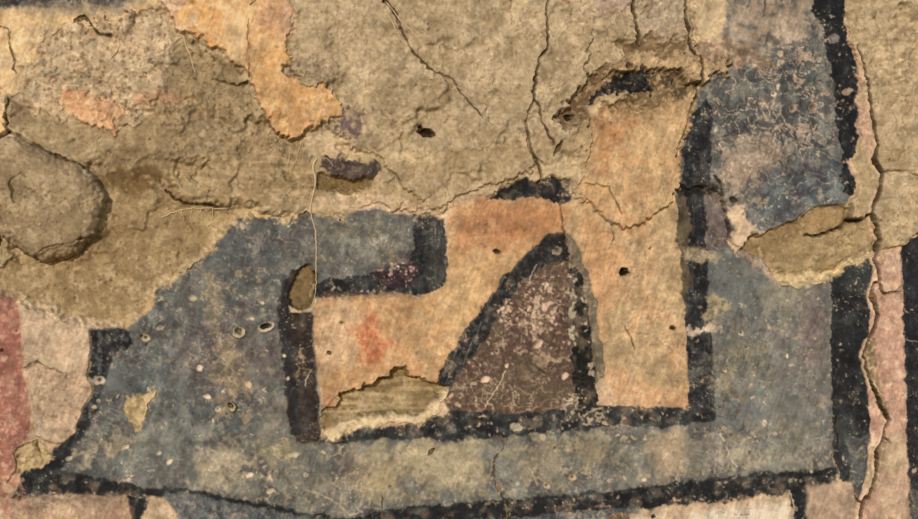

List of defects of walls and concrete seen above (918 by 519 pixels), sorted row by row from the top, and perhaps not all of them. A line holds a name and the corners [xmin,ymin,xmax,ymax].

crack [0,97,92,171]
crack [73,14,113,38]
spalling [0,0,733,331]
crack [382,0,484,119]
crack [525,0,568,260]
crack [631,0,641,49]
crack [675,0,705,158]
spalling [739,0,918,289]
crack [803,45,918,519]
spalling [15,441,55,474]
spalling [123,391,157,433]
spalling [319,367,450,443]